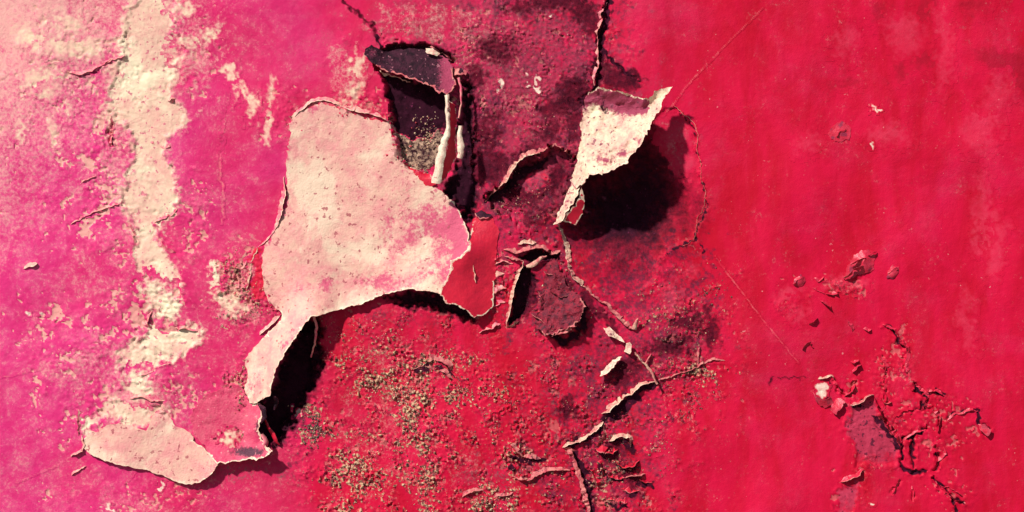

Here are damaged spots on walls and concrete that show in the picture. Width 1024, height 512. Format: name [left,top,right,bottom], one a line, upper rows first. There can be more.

peeling [71,0,686,493]
crack [660,106,708,259]
crack [562,347,725,512]
peeling [813,360,902,512]